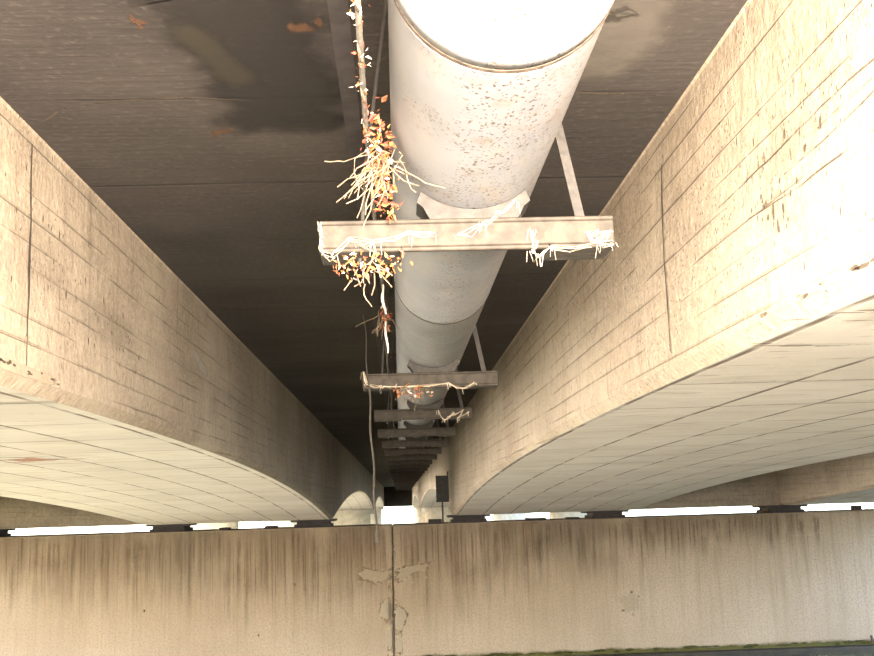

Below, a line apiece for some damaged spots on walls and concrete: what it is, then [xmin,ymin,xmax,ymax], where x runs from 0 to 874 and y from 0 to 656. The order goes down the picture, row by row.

leakage [145,0,344,130]
crack [24,144,34,366]
crack [661,164,671,351]
spalling [0,357,60,385]
peeling [357,562,430,655]